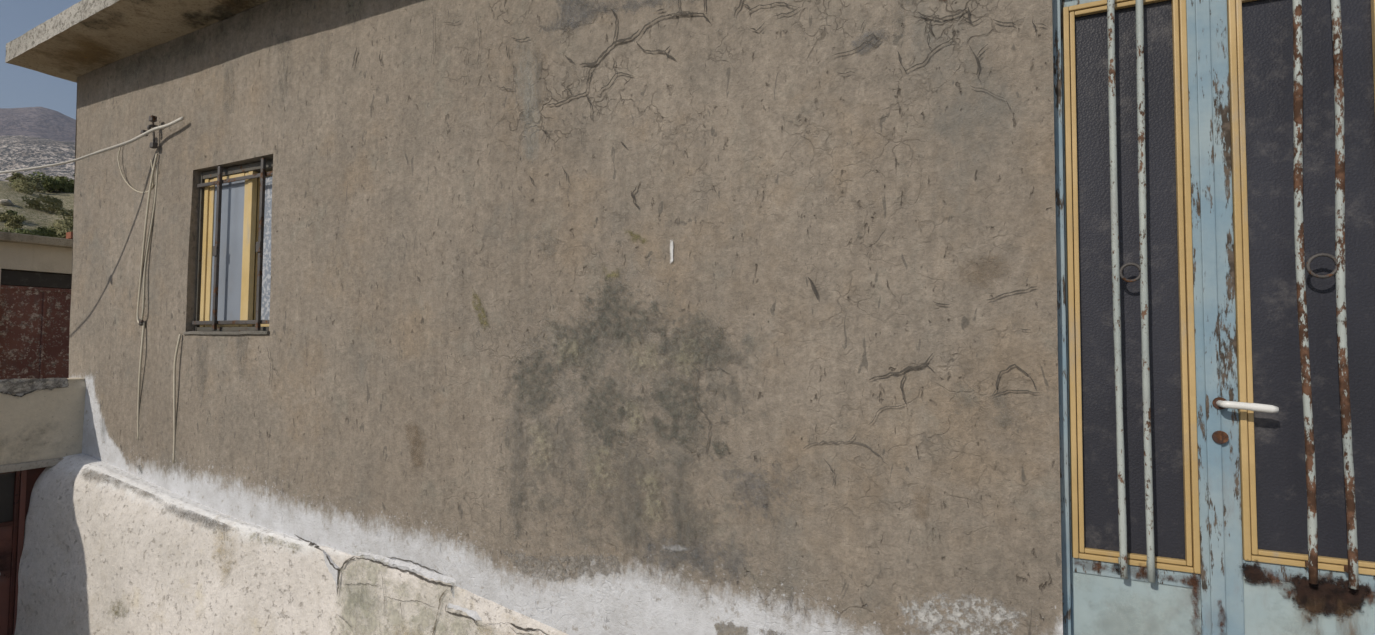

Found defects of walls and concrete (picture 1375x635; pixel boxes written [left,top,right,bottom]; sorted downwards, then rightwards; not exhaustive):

crack [529,0,799,185]
crack [832,7,1048,109]
crack [804,353,934,486]
crack [339,574,447,635]
crack [478,622,549,635]